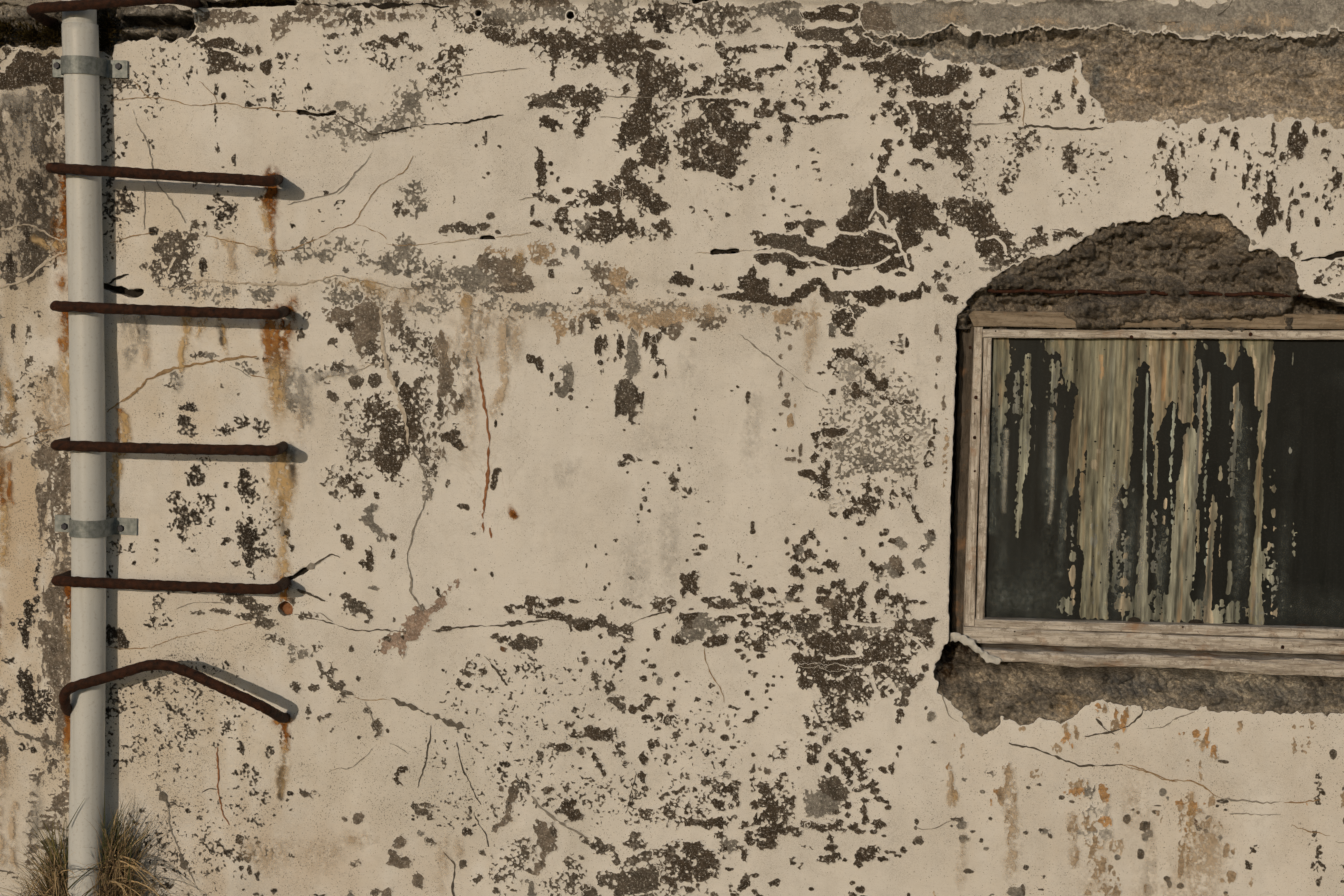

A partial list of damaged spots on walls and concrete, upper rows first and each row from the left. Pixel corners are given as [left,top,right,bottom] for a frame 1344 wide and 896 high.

crack [440,68,525,83]
crack [600,94,658,119]
peeling [1029,87,1065,118]
corrosion [262,168,279,273]
corrosion [261,299,296,411]
crack [106,81,550,686]
corrosion [269,451,295,601]
peeling [741,675,783,725]
peeling [949,815,989,851]
damp [1004,769,1019,871]
crack [1009,710,1344,843]
peeling [729,873,763,896]